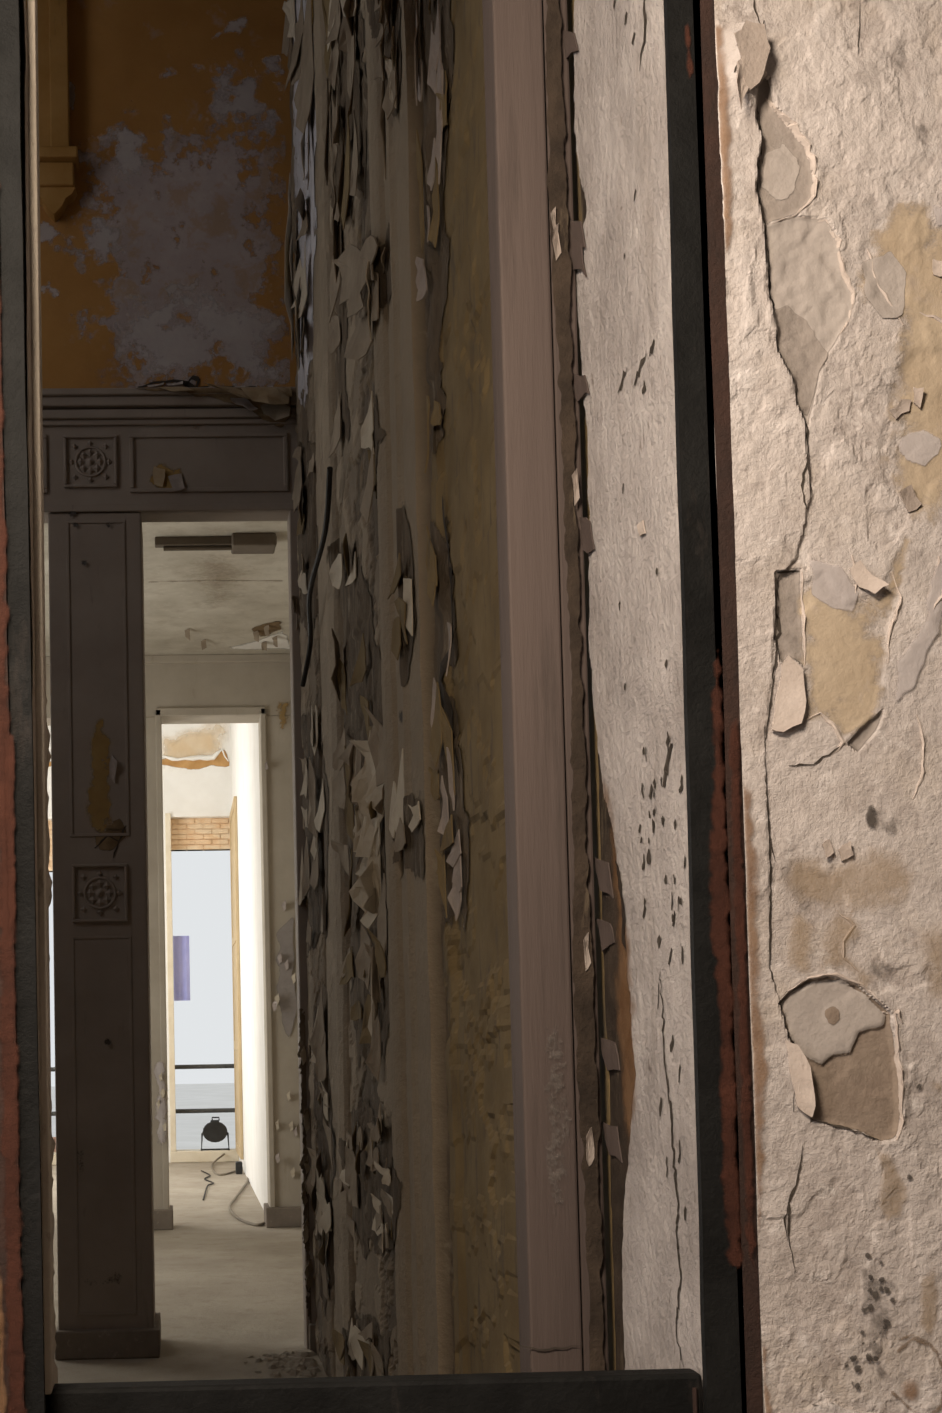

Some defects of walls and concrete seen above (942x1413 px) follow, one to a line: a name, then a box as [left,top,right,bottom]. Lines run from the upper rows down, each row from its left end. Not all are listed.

crack [734,0,812,510]
peeling [756,78,942,517]
peeling [40,0,470,1081]
peeling [764,539,909,766]
peeling [154,1062,168,1142]
peeling [297,979,402,1323]
spalling [780,910,905,1141]
peeling [332,1291,392,1377]